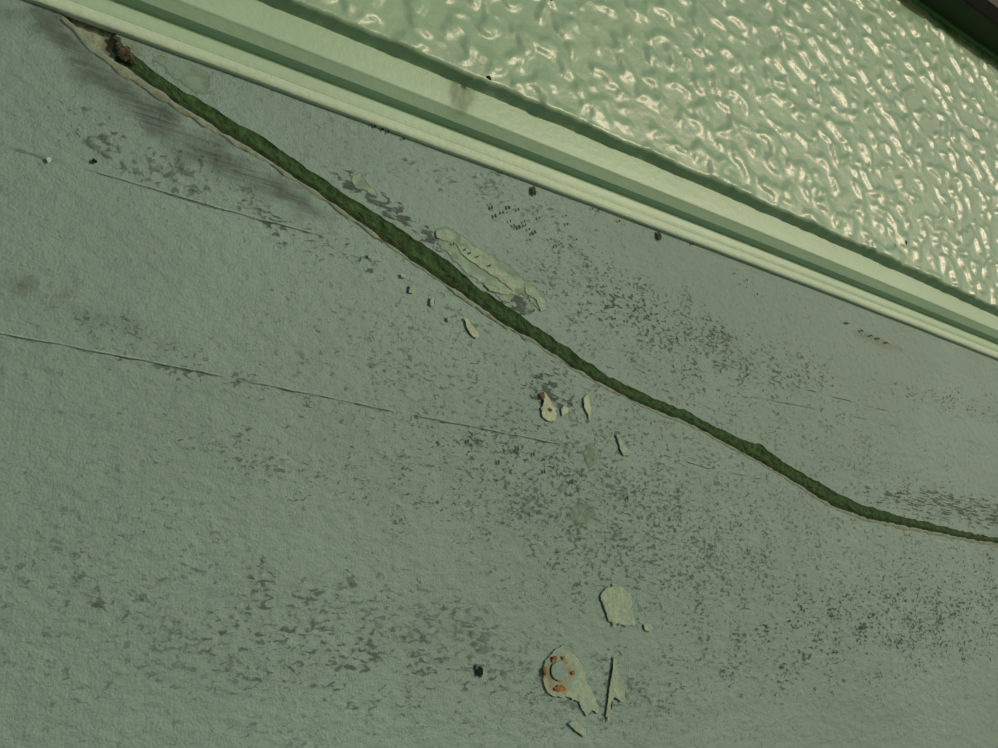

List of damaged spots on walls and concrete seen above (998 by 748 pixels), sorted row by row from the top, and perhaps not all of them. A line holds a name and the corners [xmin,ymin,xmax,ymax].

peeling [336,171,547,315]
crack [0,15,998,547]
peeling [523,373,591,422]
peeling [600,583,653,632]
peeling [541,645,626,736]